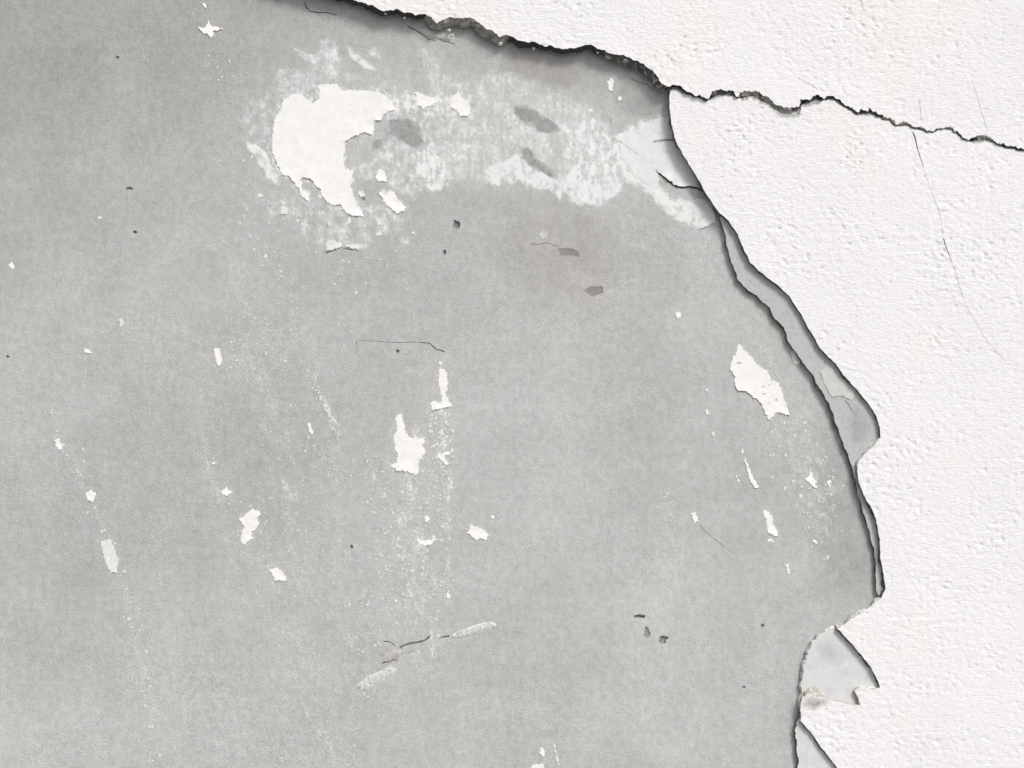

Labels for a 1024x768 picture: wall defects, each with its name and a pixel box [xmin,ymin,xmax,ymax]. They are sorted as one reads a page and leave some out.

peeling [198,21,223,39]
flaking render [335,0,426,20]
flaking render [424,15,509,44]
flaking render [508,36,604,55]
flaking render [602,50,668,91]
flaking render [656,167,880,469]
peeling [431,368,452,411]
peeling [390,414,426,476]
peeling [239,508,261,545]
peeling [467,524,489,540]
flaking render [876,523,886,598]
flaking render [798,626,880,709]